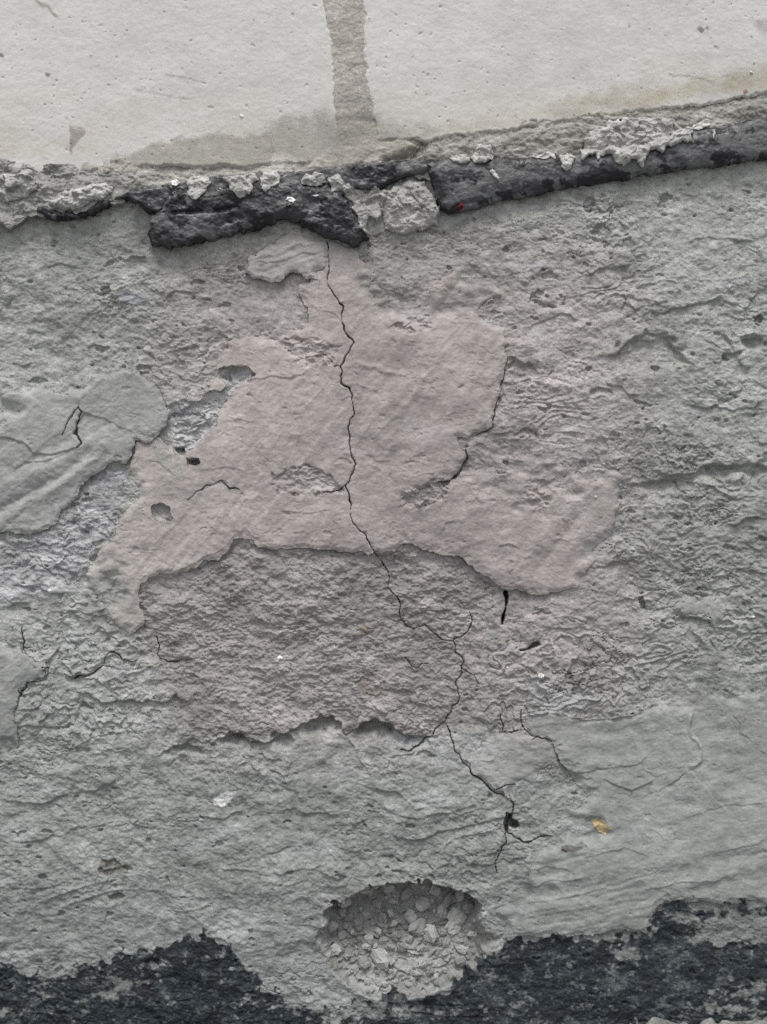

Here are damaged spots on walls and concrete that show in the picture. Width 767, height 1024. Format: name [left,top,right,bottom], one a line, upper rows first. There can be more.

spalling [366,231,473,297]
crack [62,407,82,448]
spalling [167,367,255,465]
hole [153,505,171,522]
spalling [272,465,344,496]
crack [326,242,551,871]
spalling [141,541,508,737]